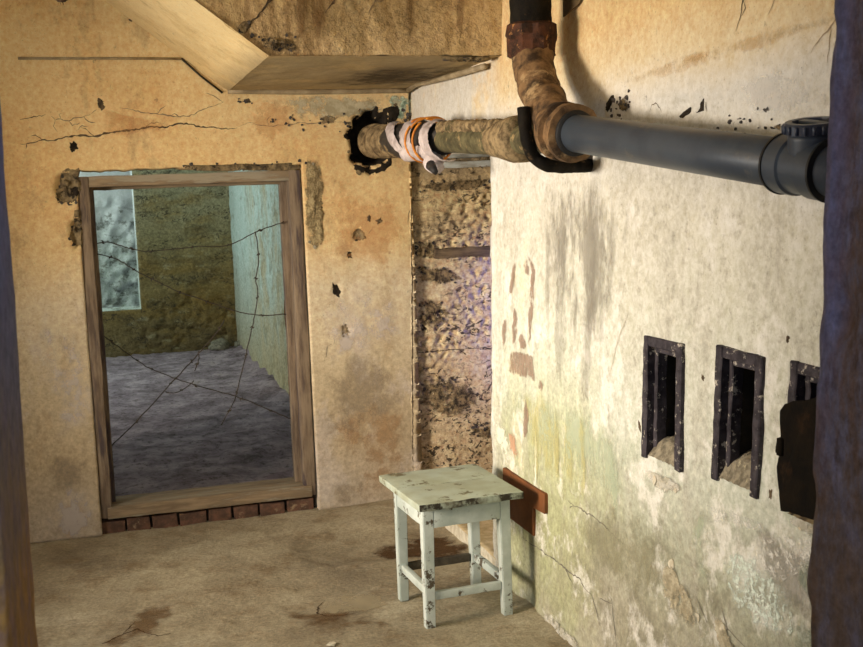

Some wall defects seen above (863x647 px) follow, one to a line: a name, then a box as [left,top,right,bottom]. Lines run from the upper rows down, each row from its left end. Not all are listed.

crack [250,0,272,22]
crack [811,20,835,63]
crack [20,93,344,148]
spalling [344,103,411,175]
spalling [55,168,83,247]
crack [525,540,616,641]